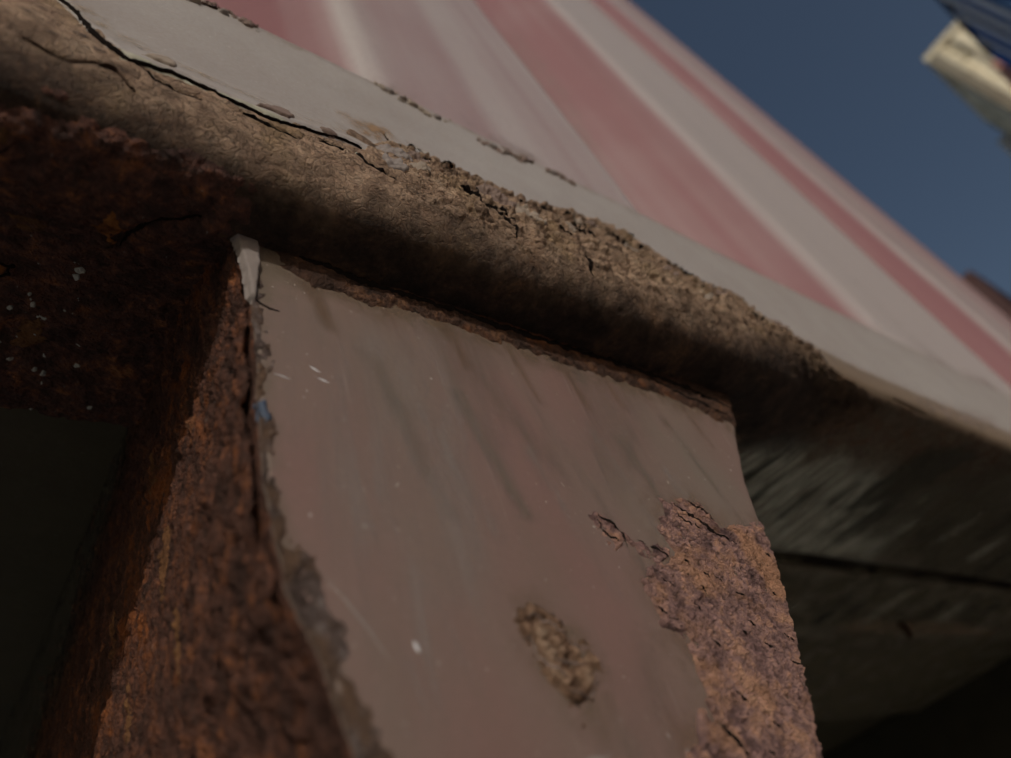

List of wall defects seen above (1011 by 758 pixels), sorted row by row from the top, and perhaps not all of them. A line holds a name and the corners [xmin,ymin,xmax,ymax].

peeling [189,0,260,32]
crack [22,0,395,179]
peeling [256,103,295,118]
peeling [374,81,451,122]
peeling [476,138,534,164]
peeling [545,167,576,186]
crack [475,184,519,238]
corrosion [0,102,346,758]
corrosion [514,602,603,711]